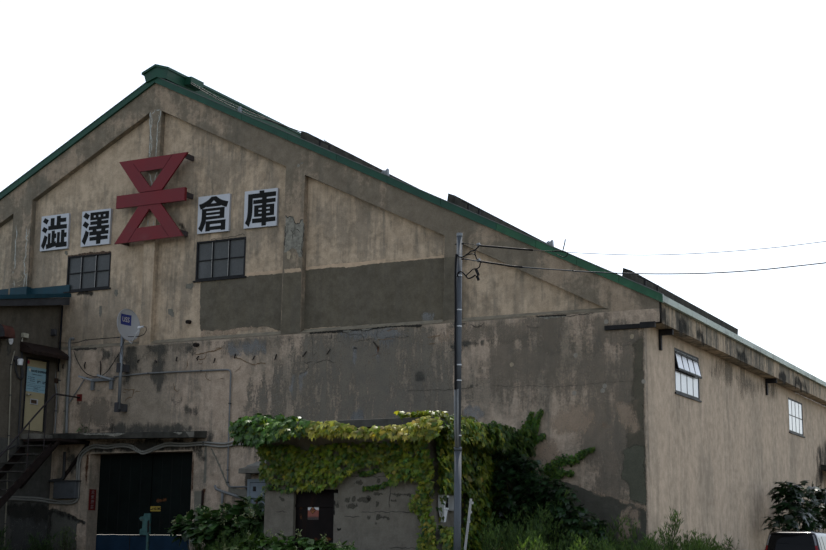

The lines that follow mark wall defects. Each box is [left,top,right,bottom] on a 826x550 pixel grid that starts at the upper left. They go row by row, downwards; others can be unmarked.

water stain [102,343,194,392]
water stain [816,442,826,486]